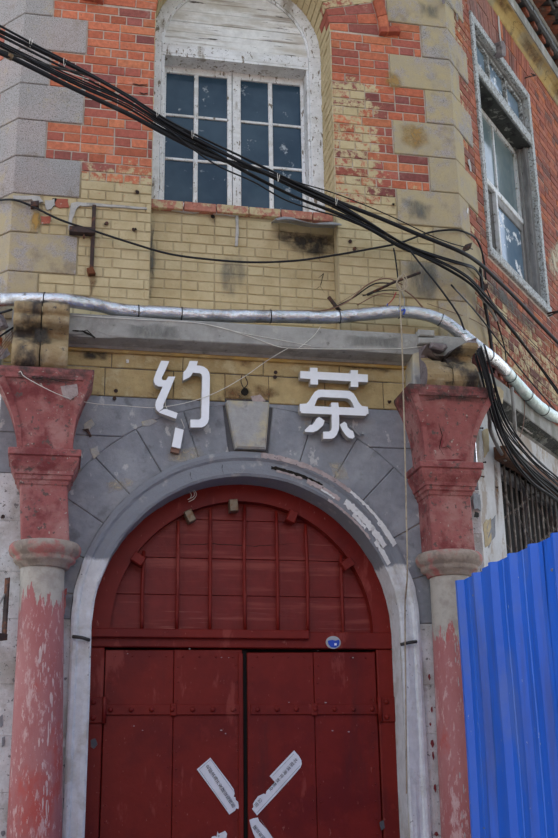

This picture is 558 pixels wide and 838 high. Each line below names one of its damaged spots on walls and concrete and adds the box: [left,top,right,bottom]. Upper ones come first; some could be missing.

peeling [60,384,78,400]
peeling [261,453,397,566]